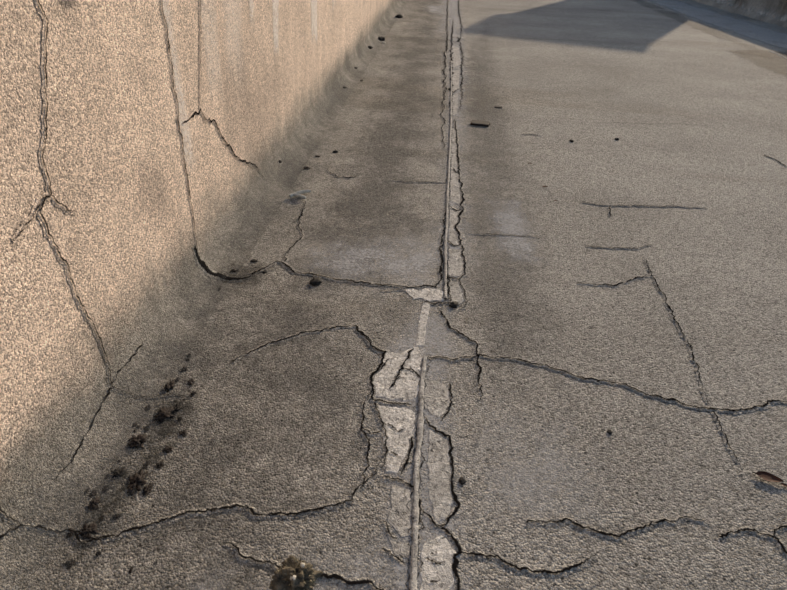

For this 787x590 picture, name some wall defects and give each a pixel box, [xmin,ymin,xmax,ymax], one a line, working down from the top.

crack [11,0,184,484]
spalling [373,128,465,473]
crack [159,0,787,464]
crack [0,325,787,590]
spalling [387,484,413,560]
spalling [419,535,457,590]
spalling [427,429,453,522]